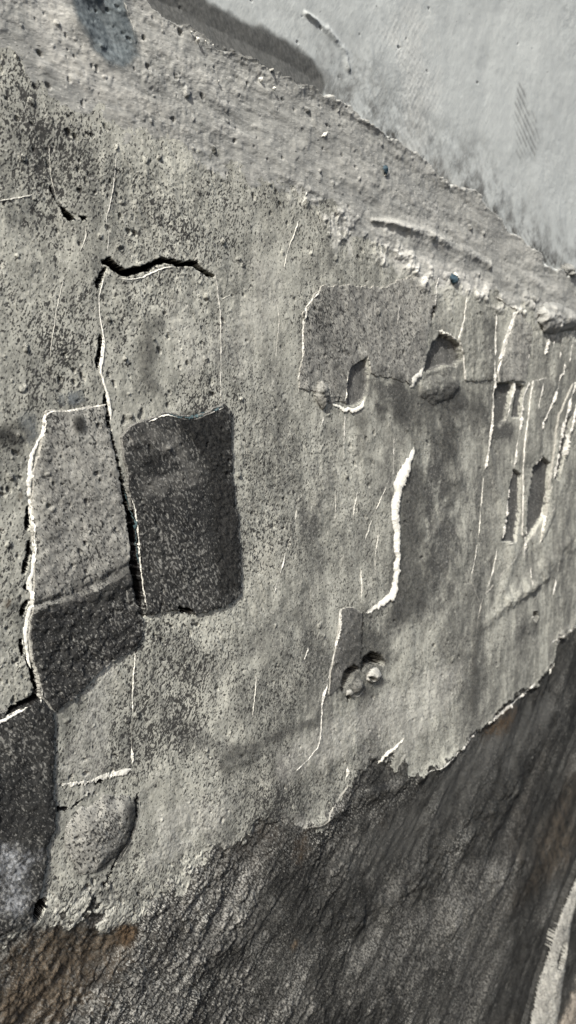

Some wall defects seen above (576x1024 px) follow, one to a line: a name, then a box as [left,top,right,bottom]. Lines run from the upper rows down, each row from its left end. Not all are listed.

crack [0,148,234,724]
peeling [0,403,242,936]
peeling [297,275,576,545]